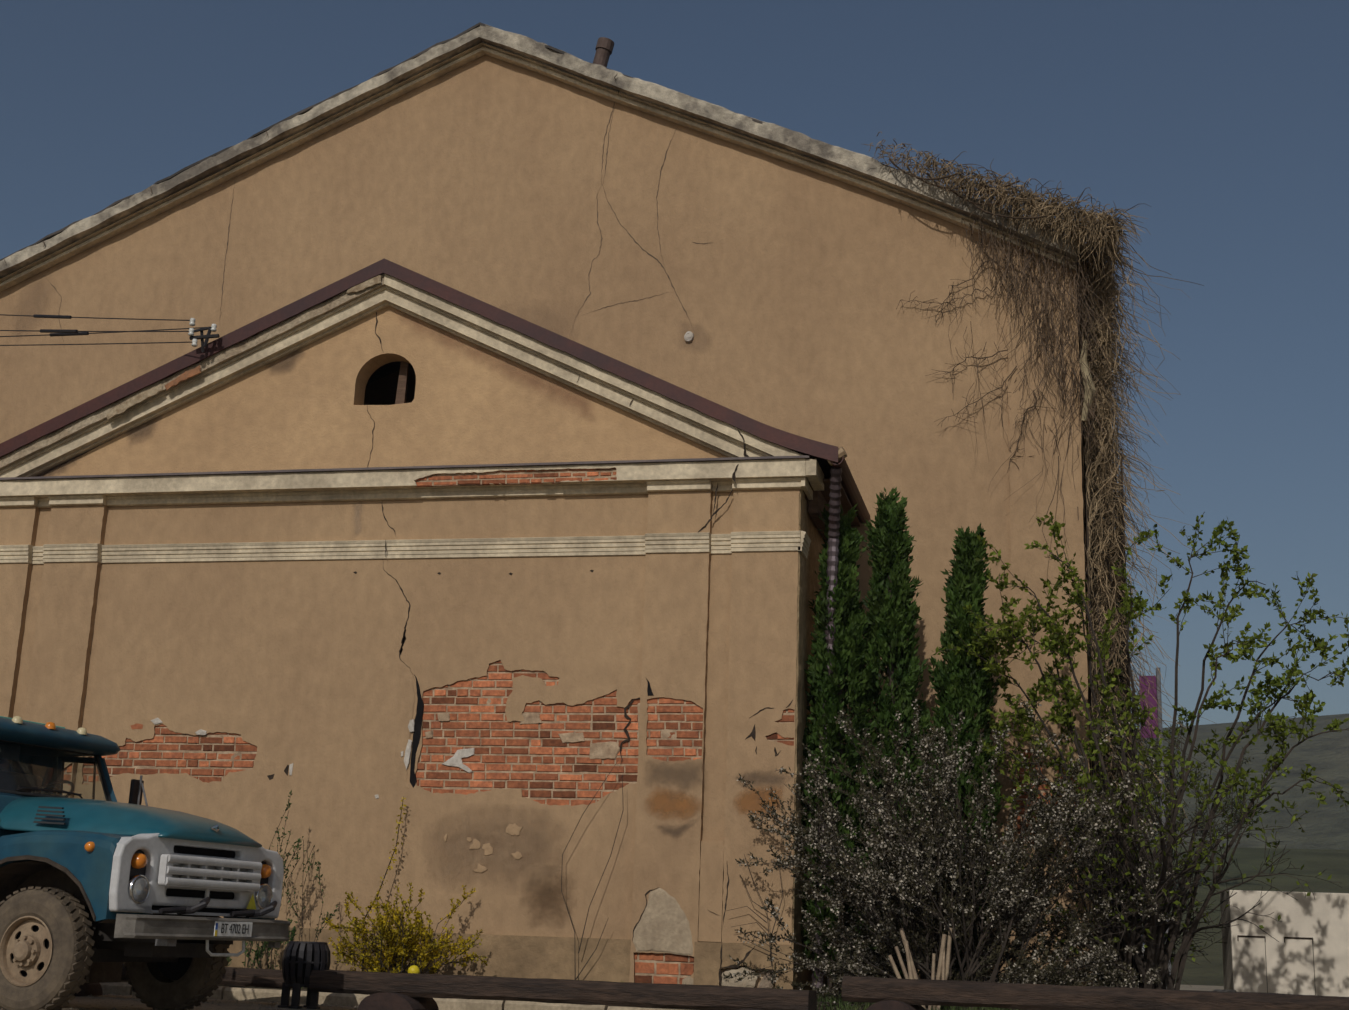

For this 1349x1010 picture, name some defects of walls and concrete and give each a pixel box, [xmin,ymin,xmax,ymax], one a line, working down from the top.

crack [571,73,694,332]
spalling [415,468,617,487]
crack [697,430,749,533]
crack [382,505,424,788]
spalling [63,718,257,786]
spalling [416,660,703,806]
spalling [746,709,794,746]
flaking render [632,887,694,985]